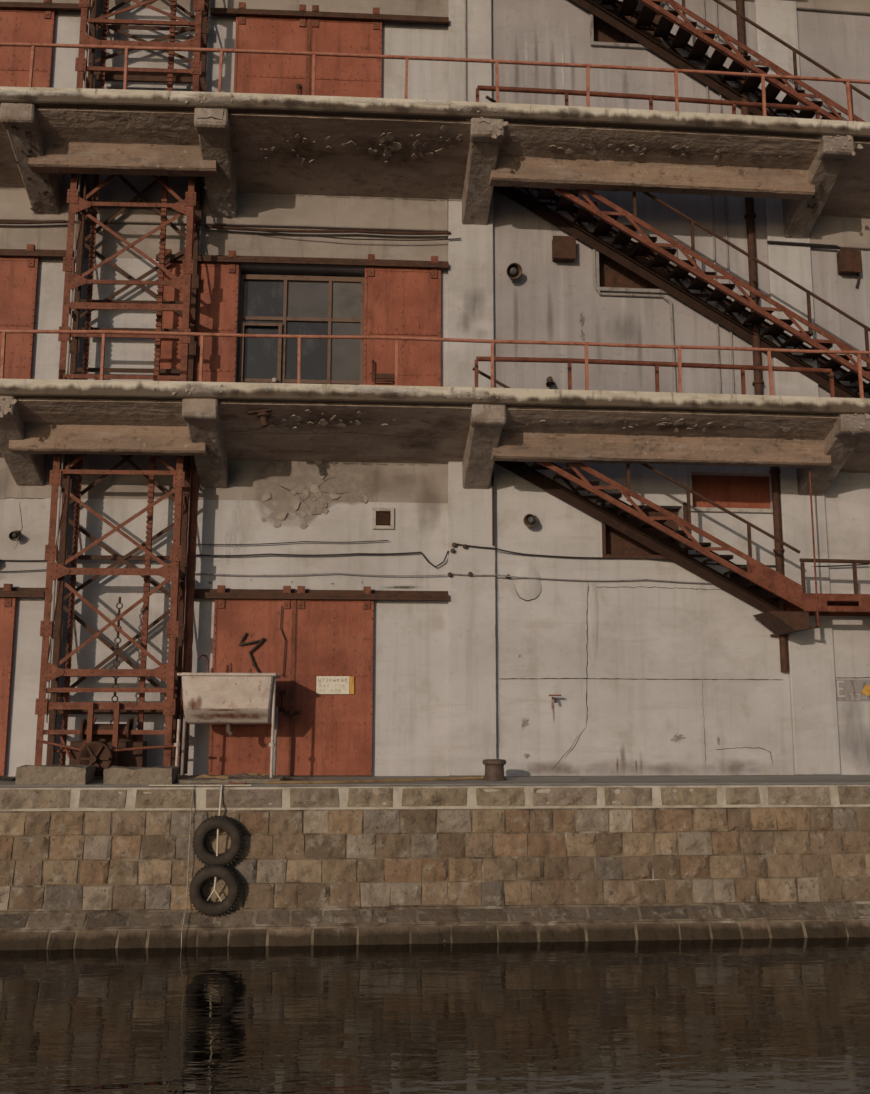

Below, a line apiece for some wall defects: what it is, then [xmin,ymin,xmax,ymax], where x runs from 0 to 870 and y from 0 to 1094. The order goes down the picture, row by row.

peeling [257,461,376,529]
crack [495,560,780,783]